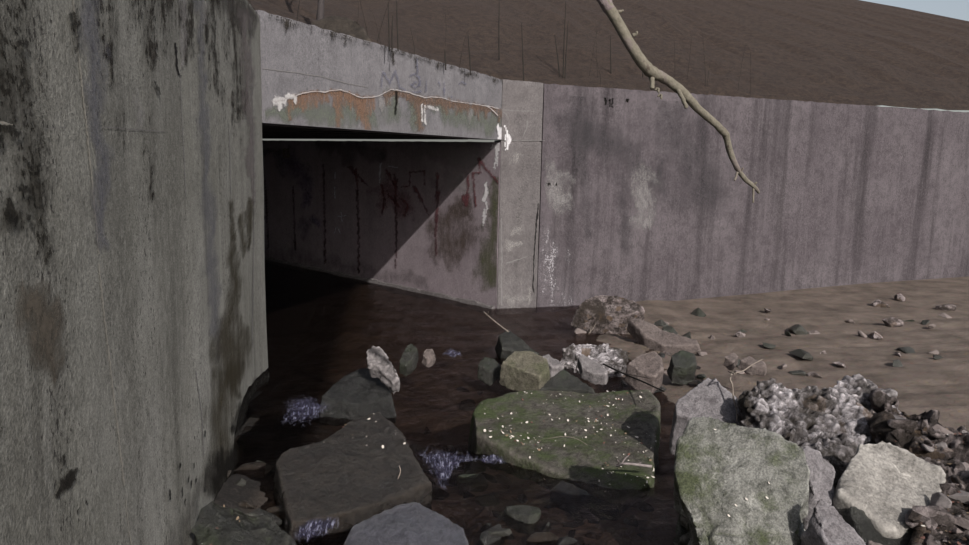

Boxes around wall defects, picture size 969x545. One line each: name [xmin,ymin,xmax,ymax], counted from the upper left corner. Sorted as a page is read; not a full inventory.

damp [0,0,51,265]
damp [94,0,502,506]
rust [288,90,502,130]